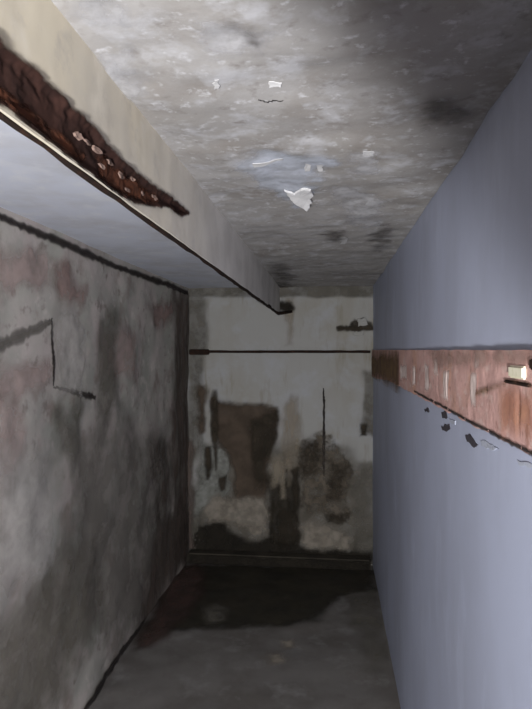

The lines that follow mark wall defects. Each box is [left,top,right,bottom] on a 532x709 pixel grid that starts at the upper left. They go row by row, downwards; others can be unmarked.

peeling [240,151,338,212]
water stain [275,269,373,302]
crack [0,318,96,400]
spalling [336,318,373,336]
crack [319,388,327,476]
spalling [371,350,532,468]
water stain [0,288,377,709]